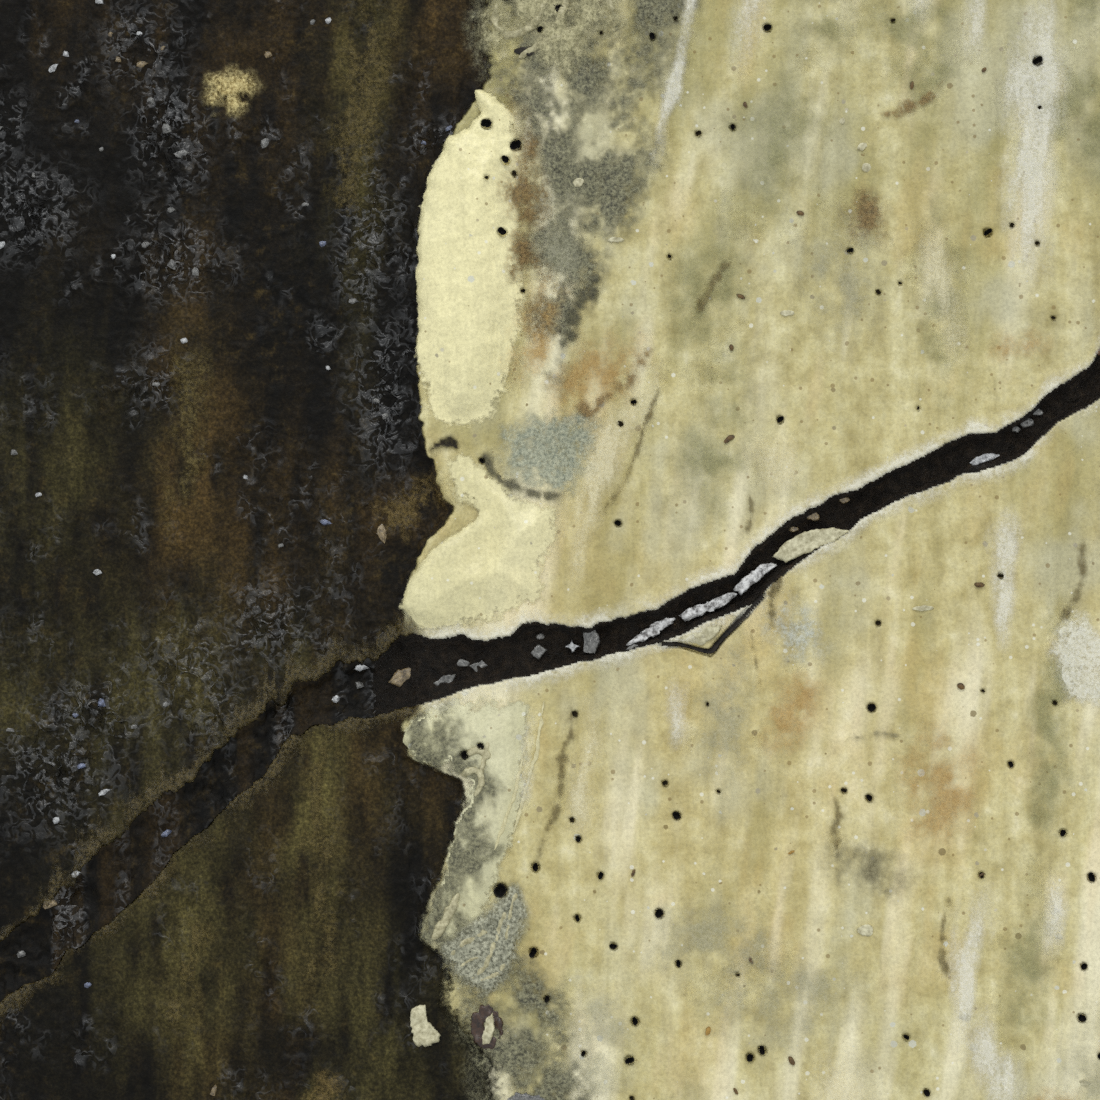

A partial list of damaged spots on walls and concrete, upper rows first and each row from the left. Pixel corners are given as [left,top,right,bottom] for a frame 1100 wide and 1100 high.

flaking render [208,71,255,112]
efflorescence [661,55,684,120]
crack [697,263,729,311]
crack [0,349,1100,1016]
spalling [431,884,528,1049]
spalling [410,1005,441,1047]
spalling [507,1092,545,1100]